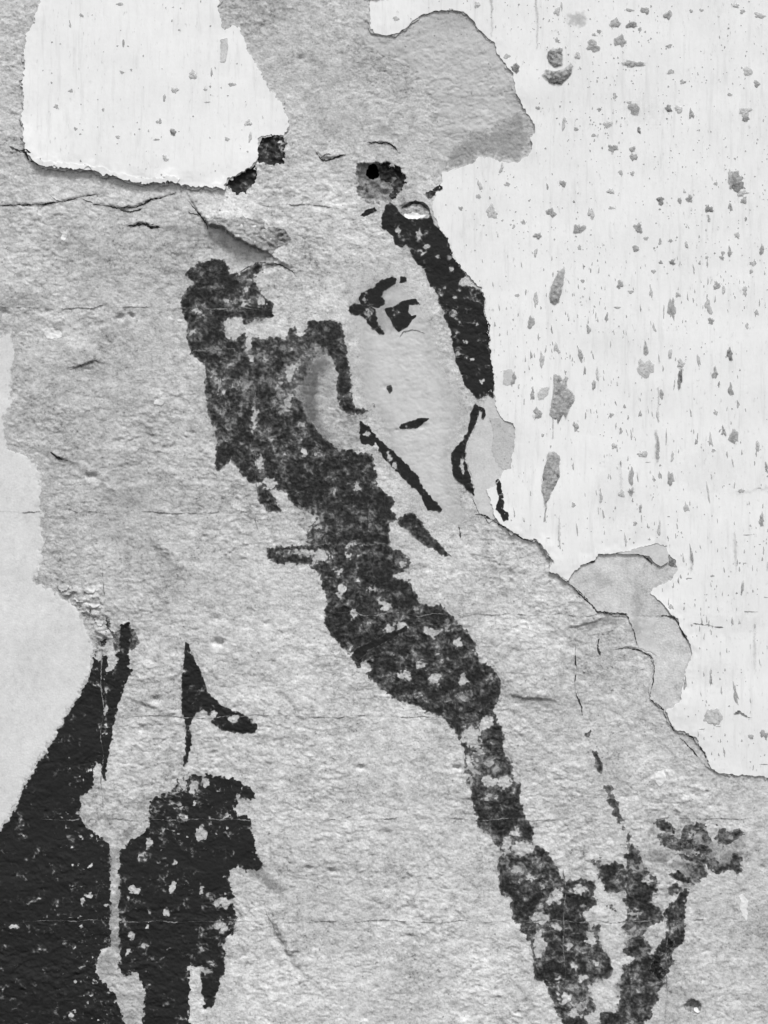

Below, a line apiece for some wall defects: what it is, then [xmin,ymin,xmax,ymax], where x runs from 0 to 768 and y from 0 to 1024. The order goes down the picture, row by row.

peeling [19,0,290,192]
peeling [356,6,535,175]
crack [0,192,208,229]
spalling [356,162,430,219]
peeling [503,369,514,386]
peeling [465,390,515,523]
spalling [58,580,113,656]
crack [352,514,723,764]
peeling [568,543,692,709]